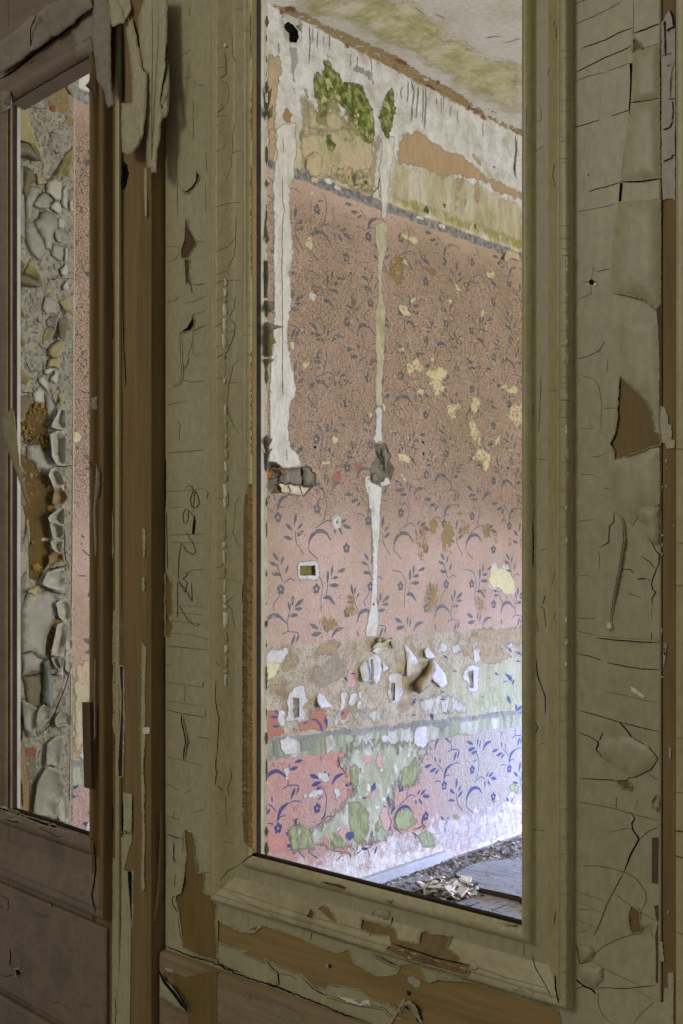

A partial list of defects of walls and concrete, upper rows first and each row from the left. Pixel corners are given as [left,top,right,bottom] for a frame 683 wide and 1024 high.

flaking render [0,0,170,834]
crack [165,9,255,568]
peeling [242,54,435,855]
damp [273,0,522,248]
peeling [413,519,475,561]
flaking render [462,589,522,693]
crack [526,0,661,186]
crack [531,453,683,670]
crack [560,157,663,276]
peeling [610,304,675,474]
peeling [112,642,562,1024]
crack [532,661,683,1023]